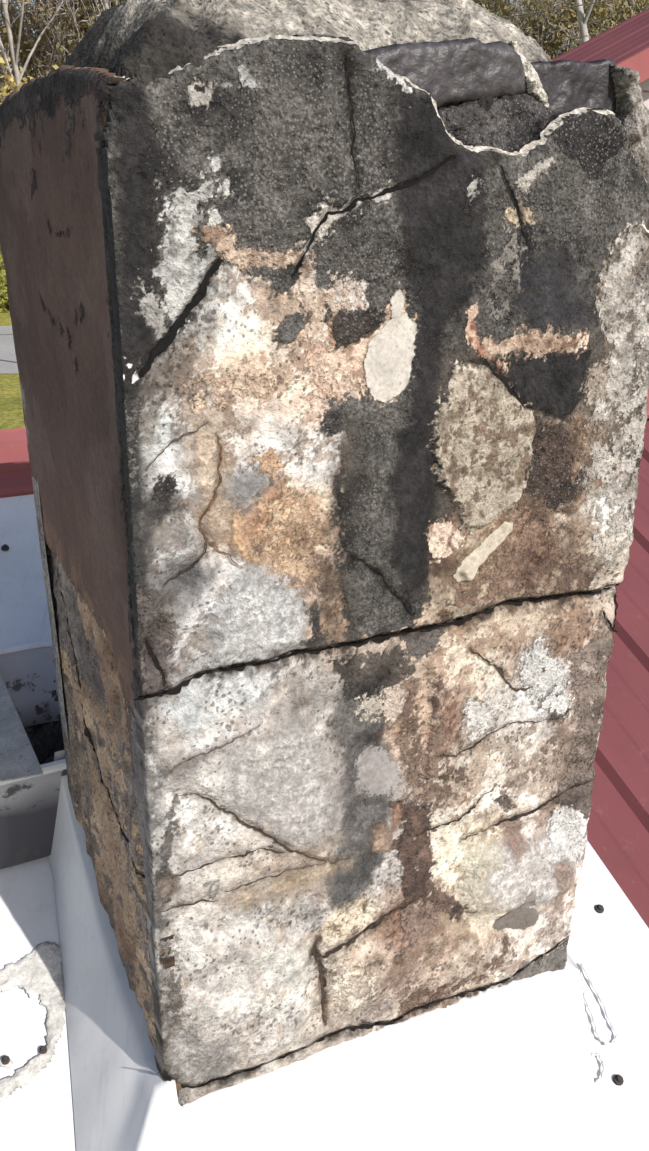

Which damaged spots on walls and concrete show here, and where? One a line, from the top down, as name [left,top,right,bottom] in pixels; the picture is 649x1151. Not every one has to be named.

crack [293,49,453,276]
crack [489,149,531,249]
crack [138,257,223,377]
peeling [104,34,649,643]
peeling [300,600,328,653]
crack [133,556,624,713]
crack [436,711,569,757]
crack [414,779,594,840]
crack [158,895,565,1089]